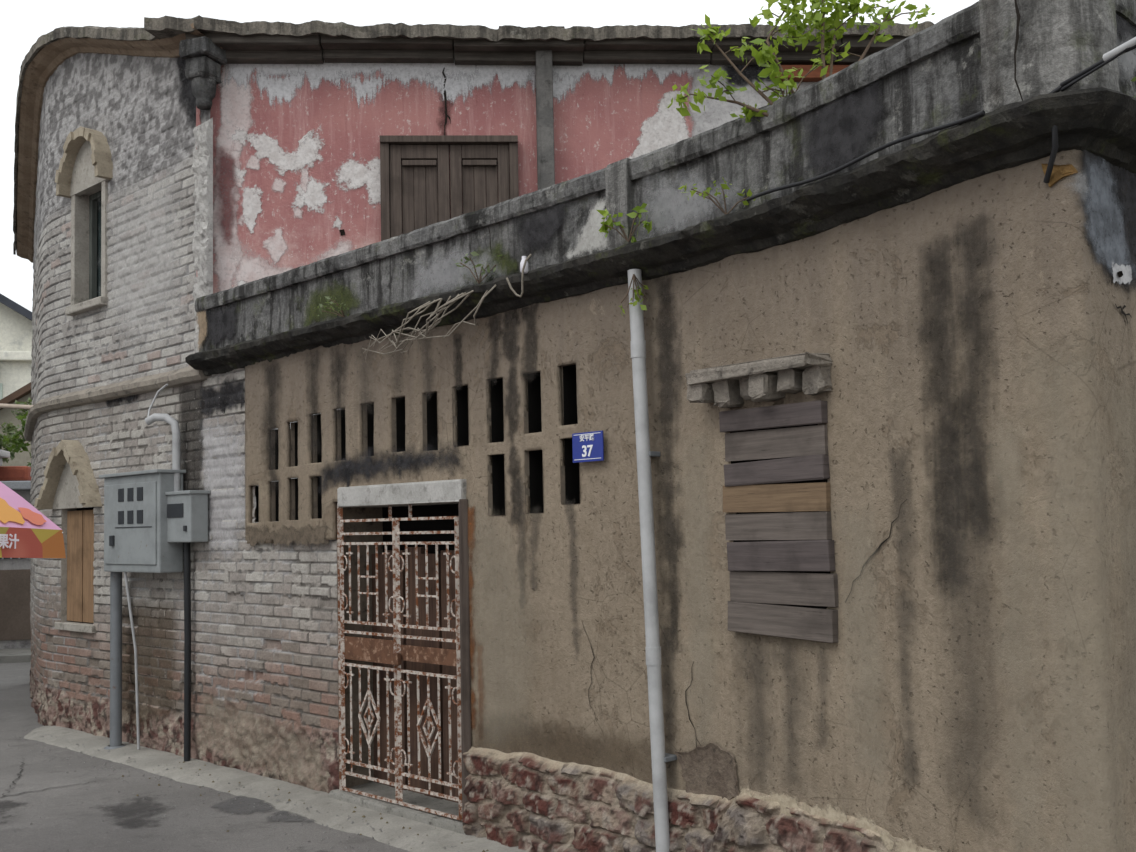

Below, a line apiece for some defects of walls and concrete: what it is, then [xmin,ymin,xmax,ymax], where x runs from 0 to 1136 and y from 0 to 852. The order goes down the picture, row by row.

crack [442,68,451,135]
peeling [213,59,536,291]
water stain [416,253,491,296]
water stain [567,200,607,259]
water stain [648,179,735,236]
water stain [1076,150,1136,291]
water stain [454,336,462,389]
water stain [921,225,990,581]
corrosion [468,507,484,737]
spalling [675,742,938,852]